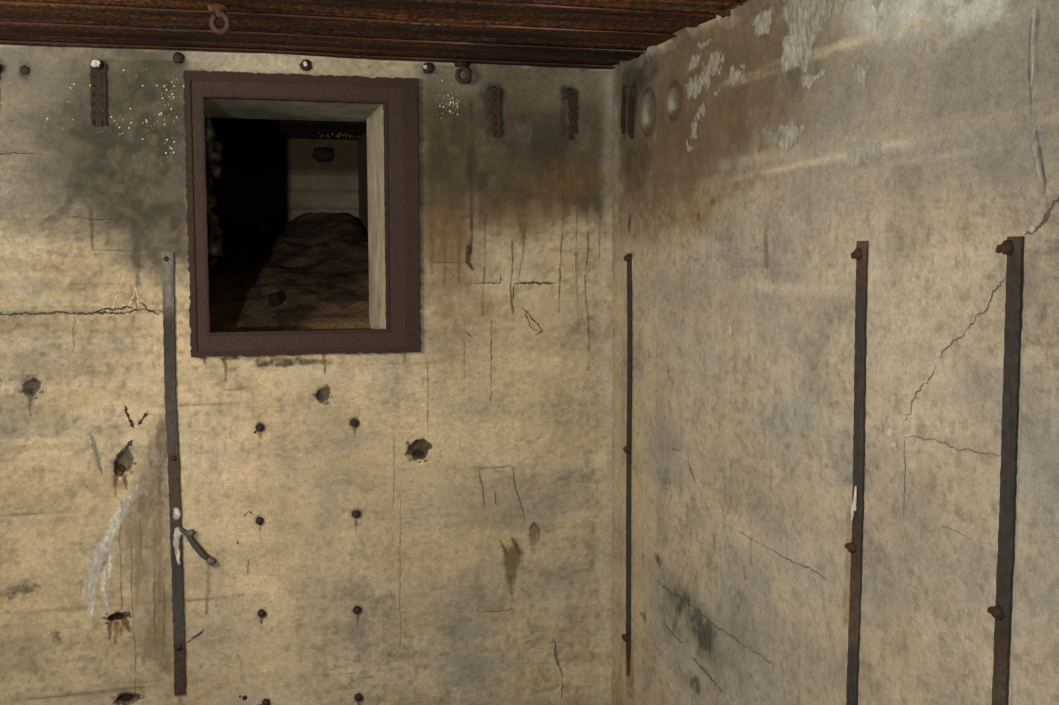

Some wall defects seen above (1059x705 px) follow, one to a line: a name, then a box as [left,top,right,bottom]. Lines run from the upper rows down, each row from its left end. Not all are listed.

crack [0,303,163,351]
water stain [71,63,186,308]
water stain [619,0,799,223]
crack [887,274,1006,520]
crack [1023,196,1059,236]
water stain [82,421,182,670]
water stain [676,595,712,652]